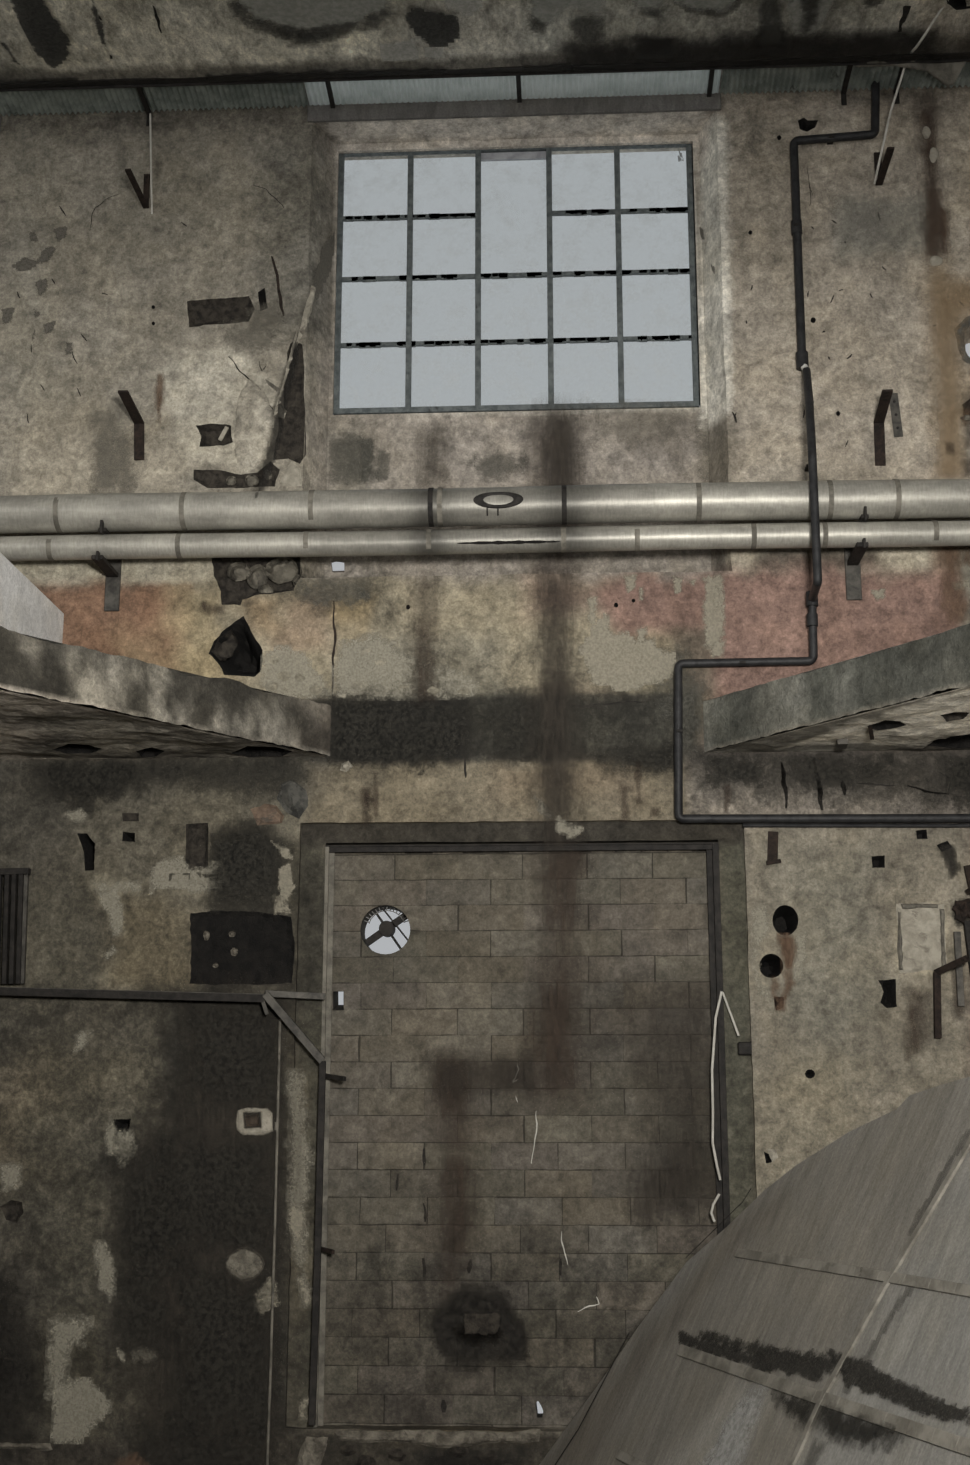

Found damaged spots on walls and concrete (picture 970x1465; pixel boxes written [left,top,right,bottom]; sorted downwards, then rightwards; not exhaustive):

peeling [193,231,335,498]
peeling [209,557,475,701]
spalling [928,712,970,748]
water stain [539,801,582,838]
rust [773,933,795,1010]